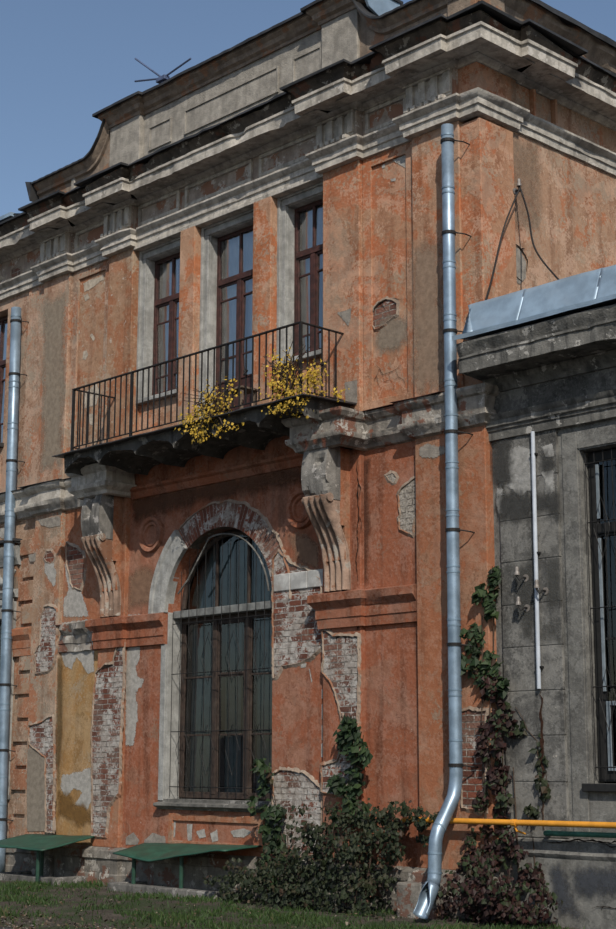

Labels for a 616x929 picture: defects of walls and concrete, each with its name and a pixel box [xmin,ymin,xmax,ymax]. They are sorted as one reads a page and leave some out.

flaking render [372,296,400,332]
peeling [38,516,60,528]
flaking render [384,470,416,538]
leakage [491,438,560,520]
flaking render [28,541,144,840]
flaking render [179,499,362,859]
flaking render [460,706,491,816]